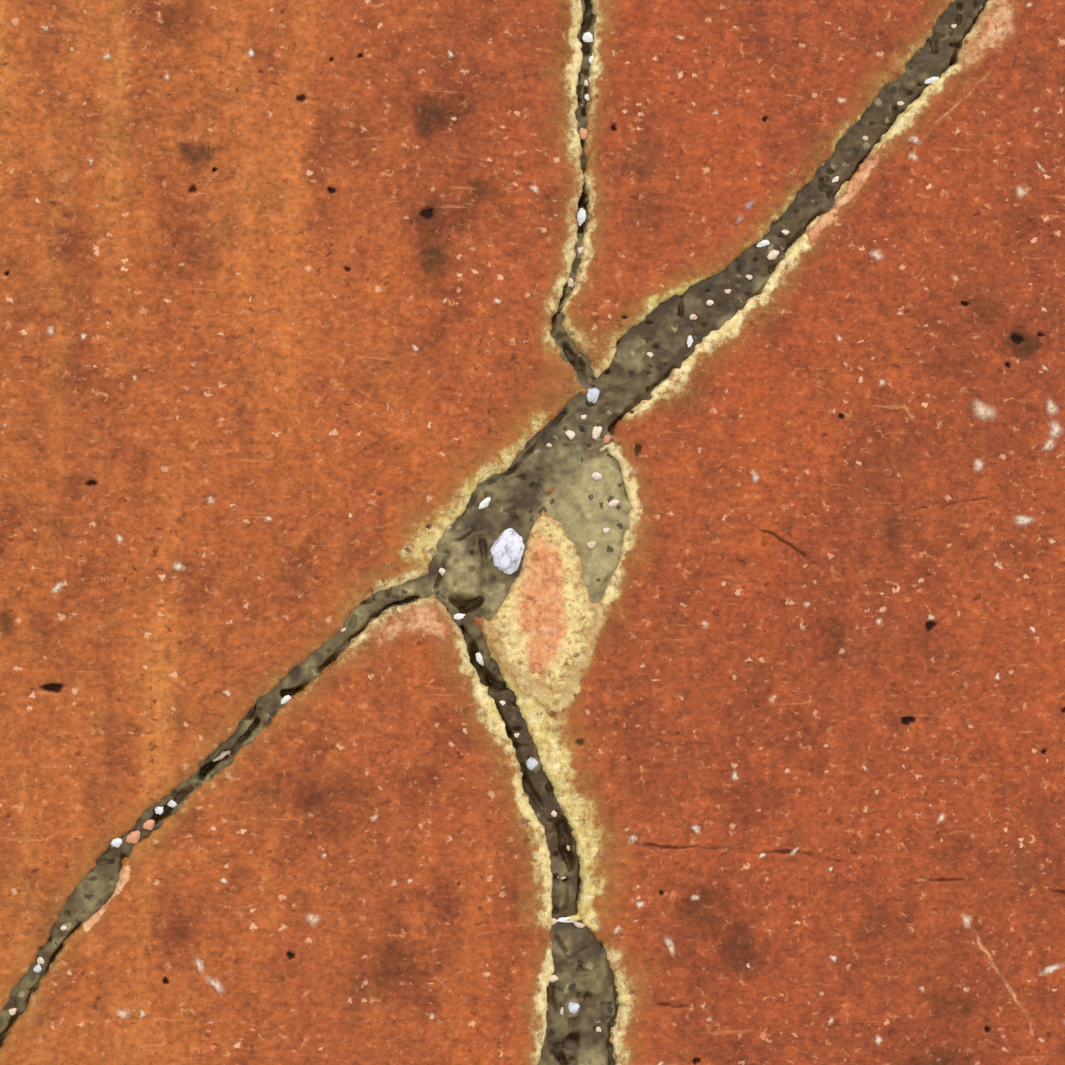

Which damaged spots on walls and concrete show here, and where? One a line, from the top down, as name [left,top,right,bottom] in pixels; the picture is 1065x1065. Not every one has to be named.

crack [550,0,987,440]
peeling [491,449,633,700]
crack [761,530,806,557]
crack [0,392,614,1048]
crack [645,842,694,850]